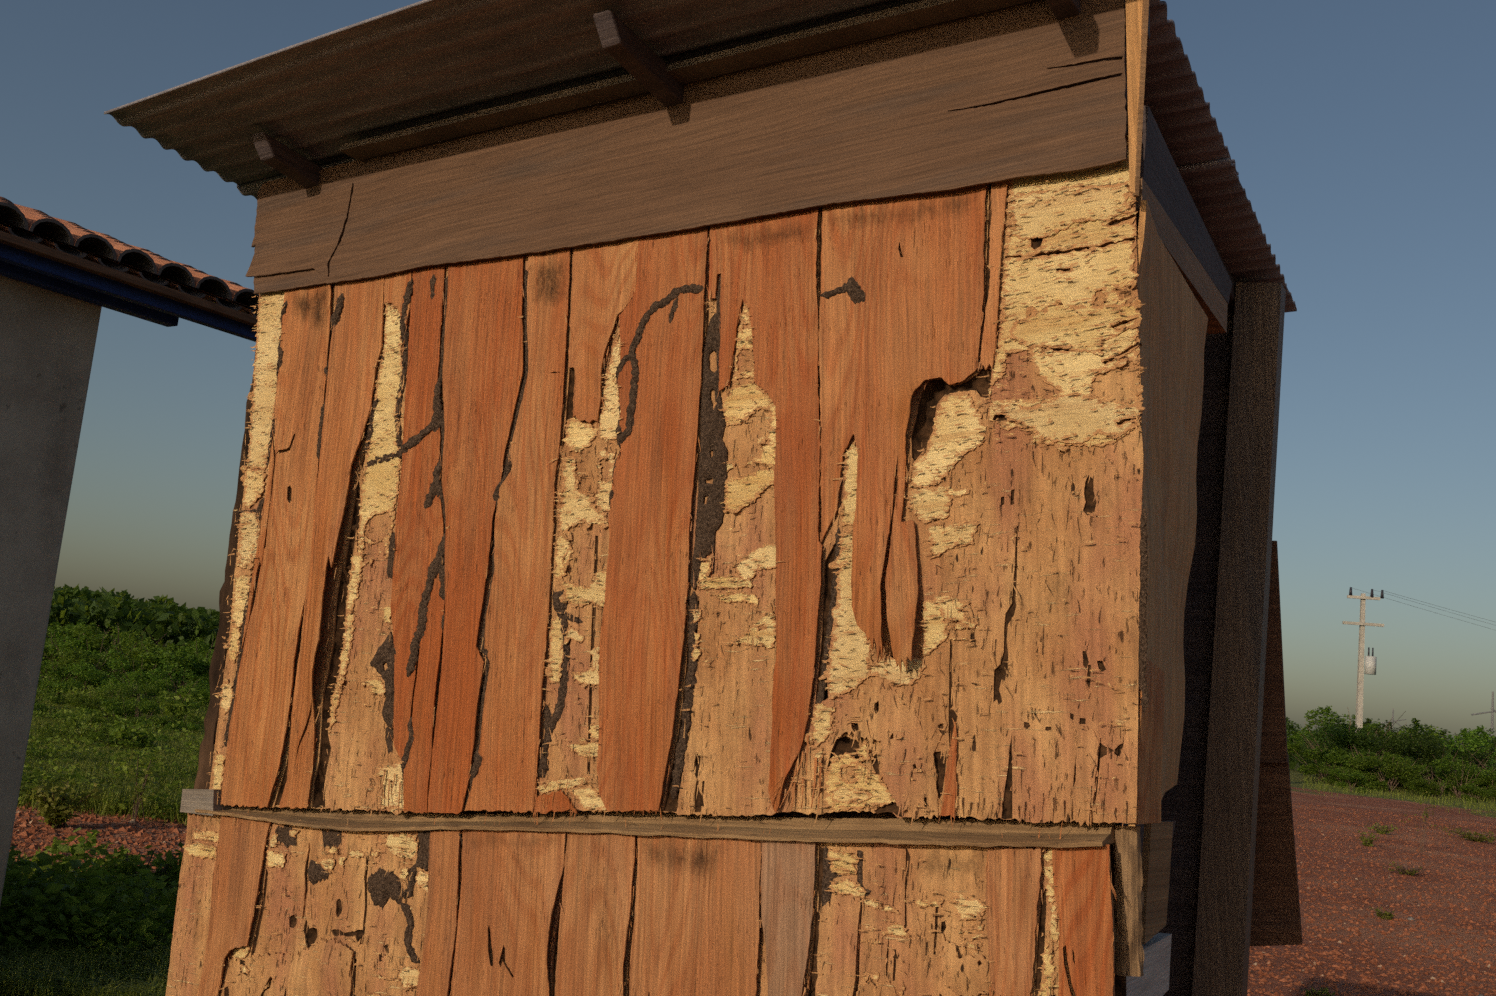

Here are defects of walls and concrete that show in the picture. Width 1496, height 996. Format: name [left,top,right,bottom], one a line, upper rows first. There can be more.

peeling [212,290,285,719]
peeling [318,300,407,733]
peeling [542,328,624,759]
peeling [679,537,782,704]
peeling [713,301,778,530]
peeling [791,441,990,813]
peeling [898,135,1145,582]
peeling [266,805,322,877]
peeling [307,753,430,908]
peeling [535,774,607,811]
peeling [824,849,994,996]
peeling [1036,848,1060,996]